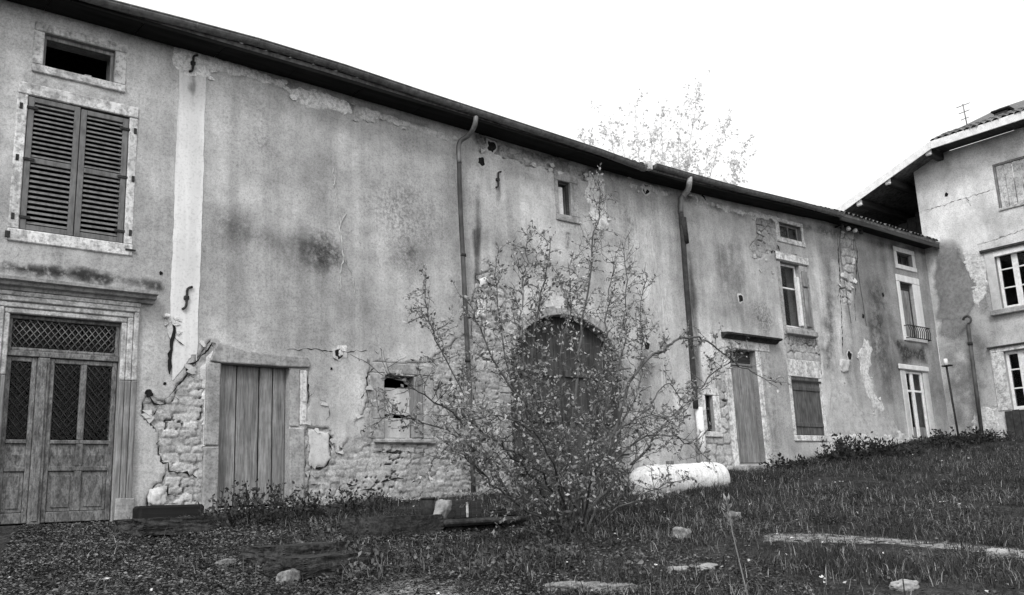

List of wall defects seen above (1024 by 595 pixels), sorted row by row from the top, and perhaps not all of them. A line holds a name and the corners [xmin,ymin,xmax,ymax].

flaking render [172,47,458,143]
damp [10,265,113,284]
damp [935,243,975,339]
flaking render [962,249,988,307]
flaking render [332,345,347,361]
flaking render [141,410,155,424]
flaking render [306,414,374,470]
crack [295,348,422,505]
flaking render [825,339,913,453]